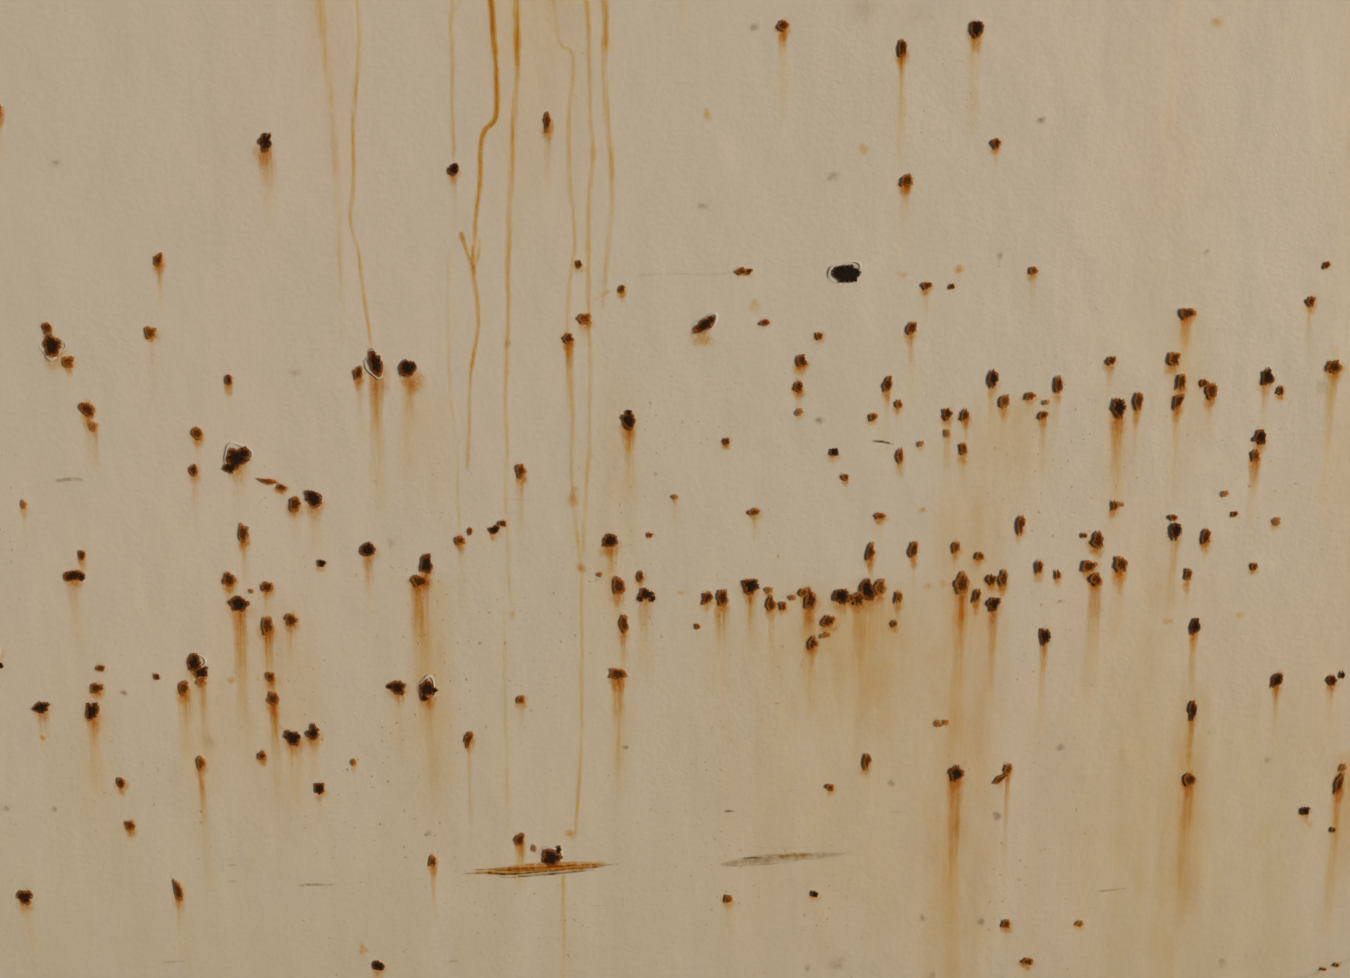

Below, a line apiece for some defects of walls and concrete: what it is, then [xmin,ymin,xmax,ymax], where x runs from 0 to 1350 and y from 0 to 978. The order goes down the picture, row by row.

rust [563,313,591,344]
rust [1000,375,1063,420]
rust [1168,352,1218,410]
rust [78,402,98,432]
rust [943,408,970,455]
rust [257,478,301,512]
rust [1082,530,1104,587]
rust [597,570,644,594]
rust [702,589,729,606]
rust [955,569,1008,603]
rust [262,613,298,636]
rust [765,586,837,650]